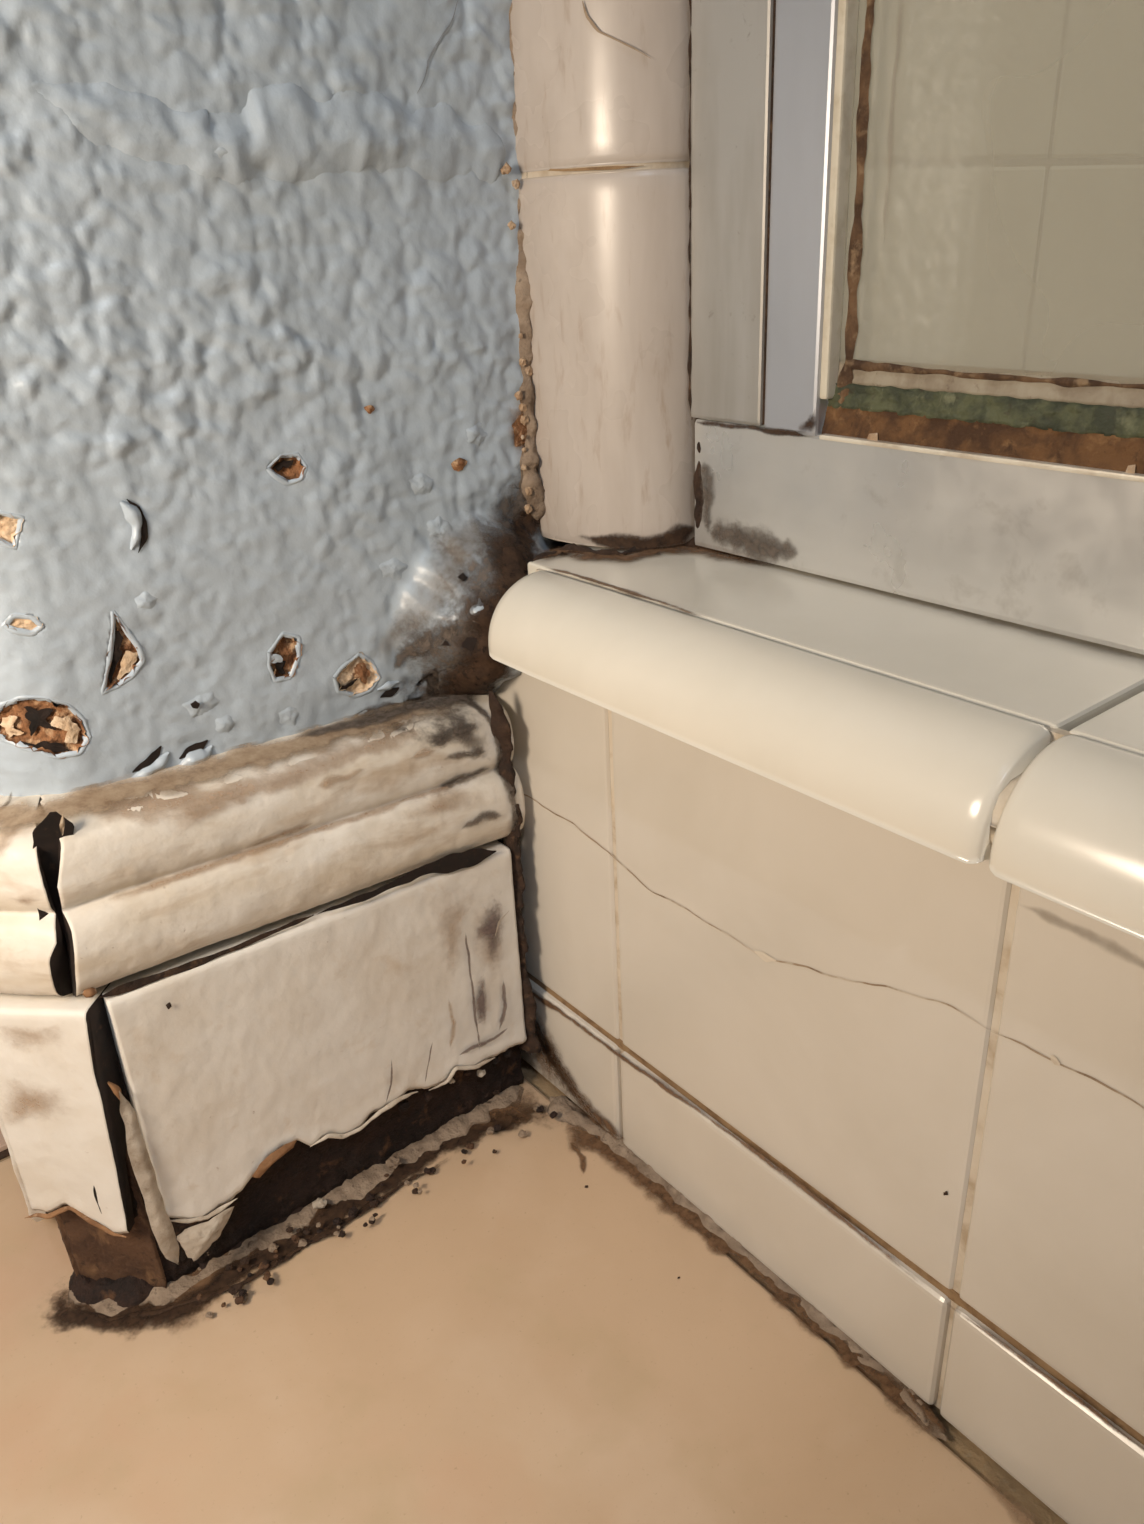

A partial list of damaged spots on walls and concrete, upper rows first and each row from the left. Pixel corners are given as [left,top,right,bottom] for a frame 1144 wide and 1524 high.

peeling [266,452,308,486]
damp [551,569,693,614]
peeling [101,610,146,695]
damp [0,469,541,843]
peeling [266,632,302,683]
peeling [0,695,92,759]
crack [32,811,97,998]
crack [524,794,1144,1109]
peeling [252,908,509,1178]
crack [107,1076,131,1104]
crack [93,1184,146,1218]
peeling [119,1091,237,1264]